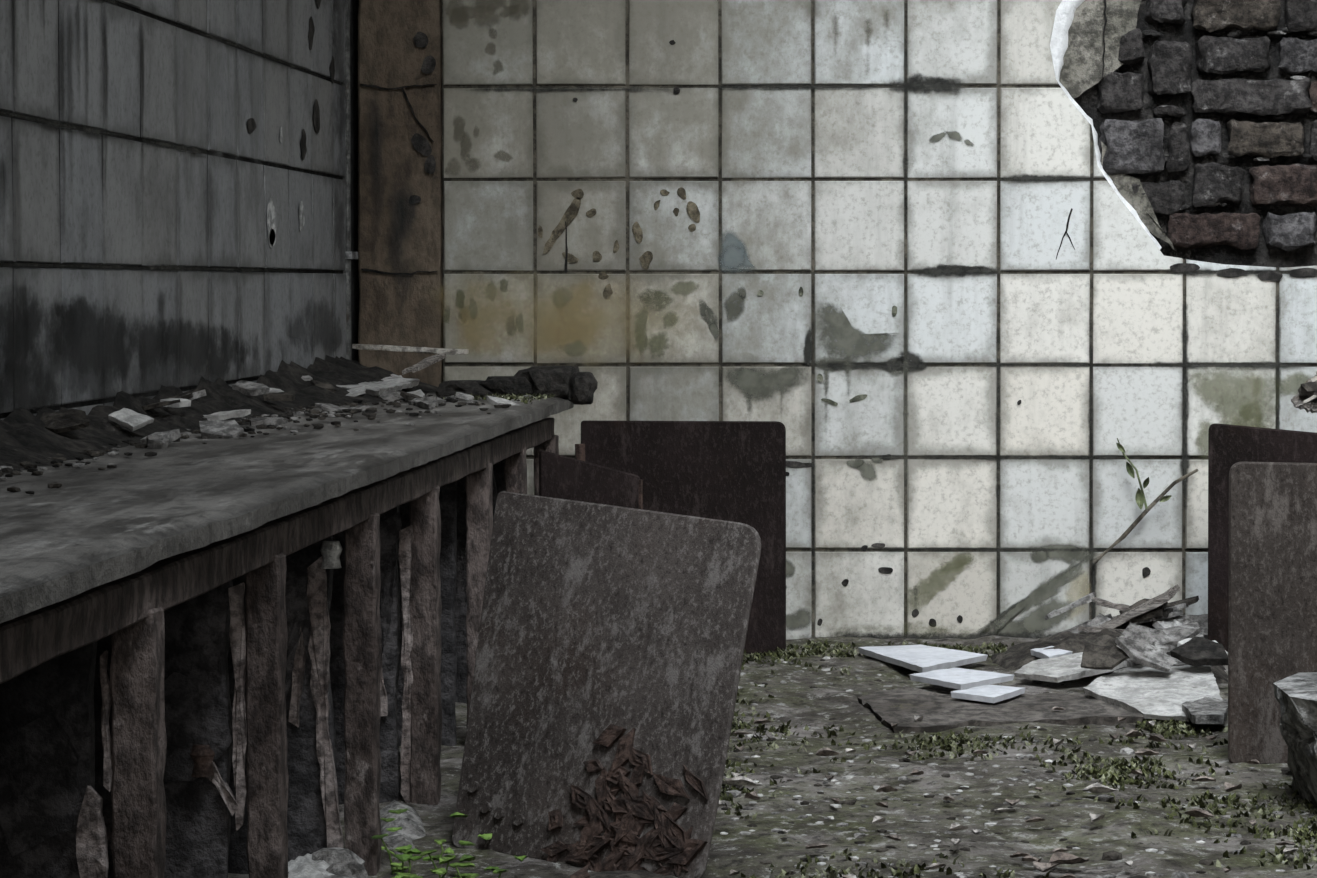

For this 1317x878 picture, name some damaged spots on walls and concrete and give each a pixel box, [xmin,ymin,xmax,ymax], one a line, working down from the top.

water stain [0,4,208,154]
water stain [447,0,644,92]
water stain [446,118,478,174]
spalling [1050,0,1317,282]
water stain [11,263,293,273]
water stain [700,288,746,339]
water stain [720,232,754,270]
water stain [729,304,927,629]